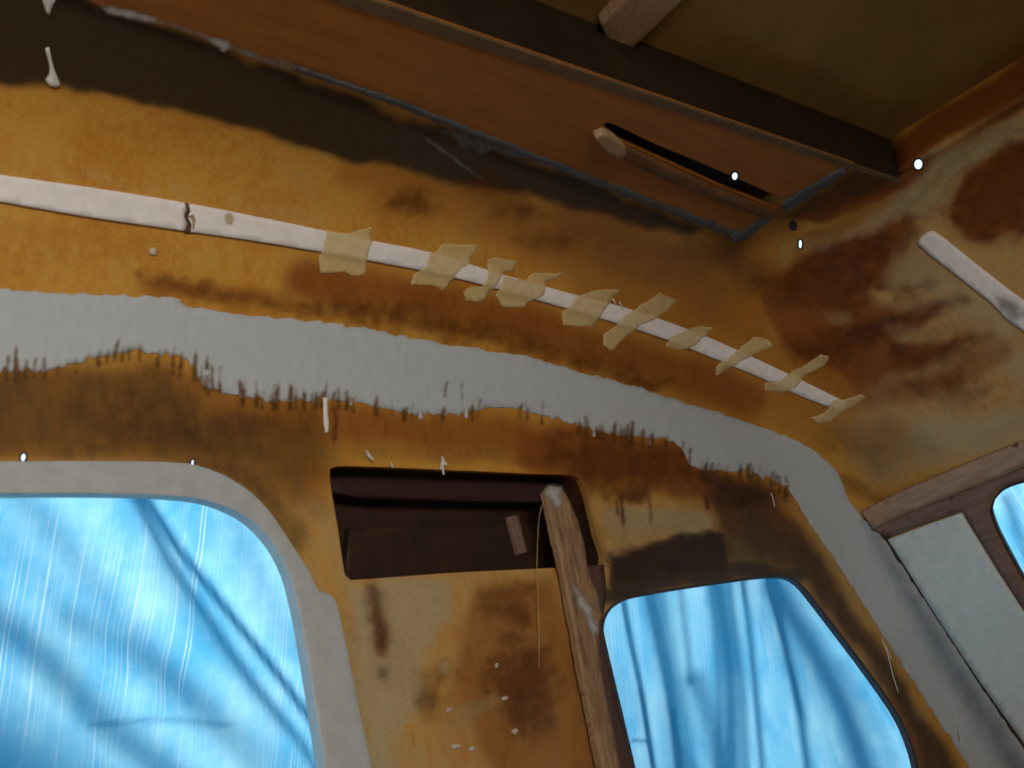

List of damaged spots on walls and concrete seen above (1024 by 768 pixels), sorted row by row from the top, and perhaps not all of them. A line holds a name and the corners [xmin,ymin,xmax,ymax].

crack [183,203,195,233]
peeling [546,487,561,507]